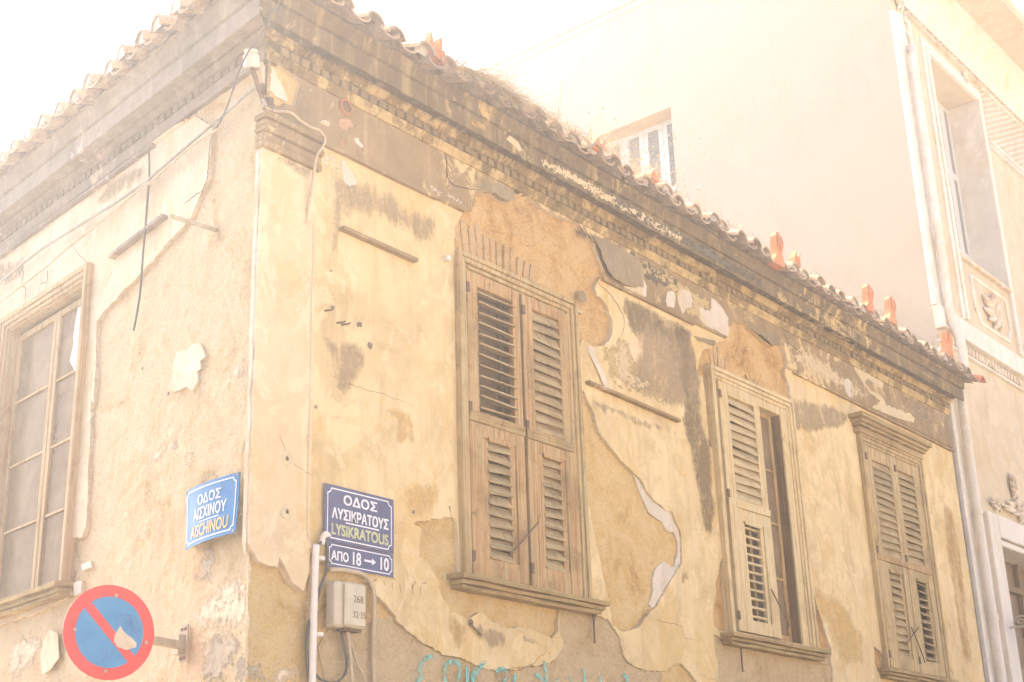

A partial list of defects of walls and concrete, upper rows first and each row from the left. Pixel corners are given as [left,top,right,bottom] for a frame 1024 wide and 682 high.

crack [184,139,211,212]
spalling [0,63,697,682]
damp [336,182,432,237]
damp [624,300,714,530]
spalling [430,183,915,423]
damp [795,402,846,431]